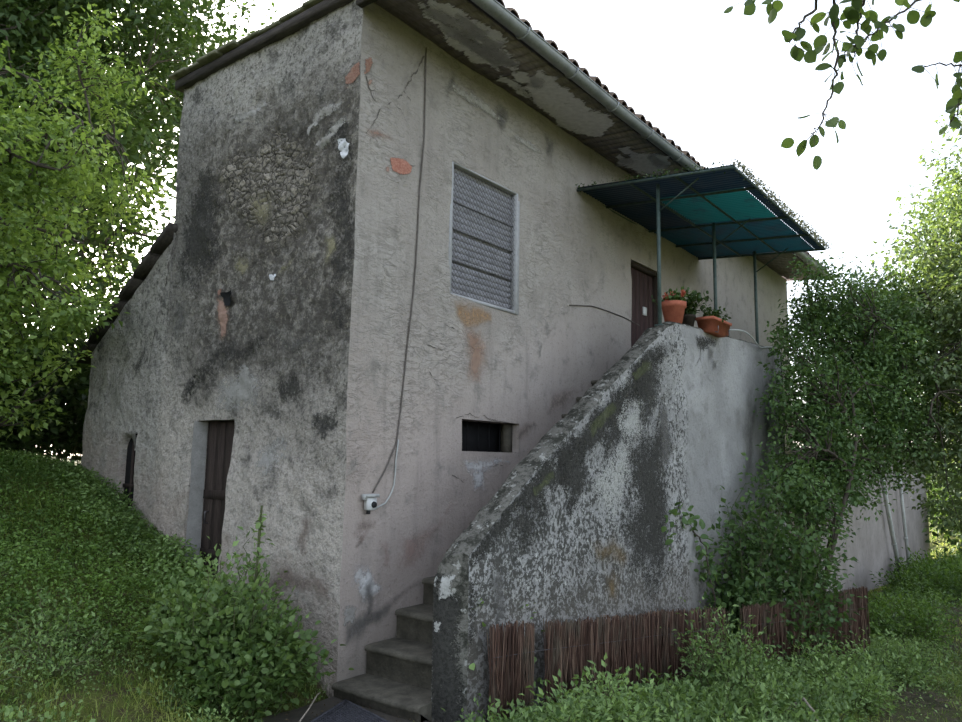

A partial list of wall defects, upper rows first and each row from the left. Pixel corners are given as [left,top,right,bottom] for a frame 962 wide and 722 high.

peeling [417,0,616,137]
flaking render [217,99,350,254]
flaking render [386,158,412,174]
peeling [616,146,671,177]
damp [179,166,221,298]
damp [327,122,354,329]
flaking render [217,289,231,336]
damp [181,336,265,403]
damp [277,376,302,402]
damp [312,408,338,439]
damp [431,344,675,722]